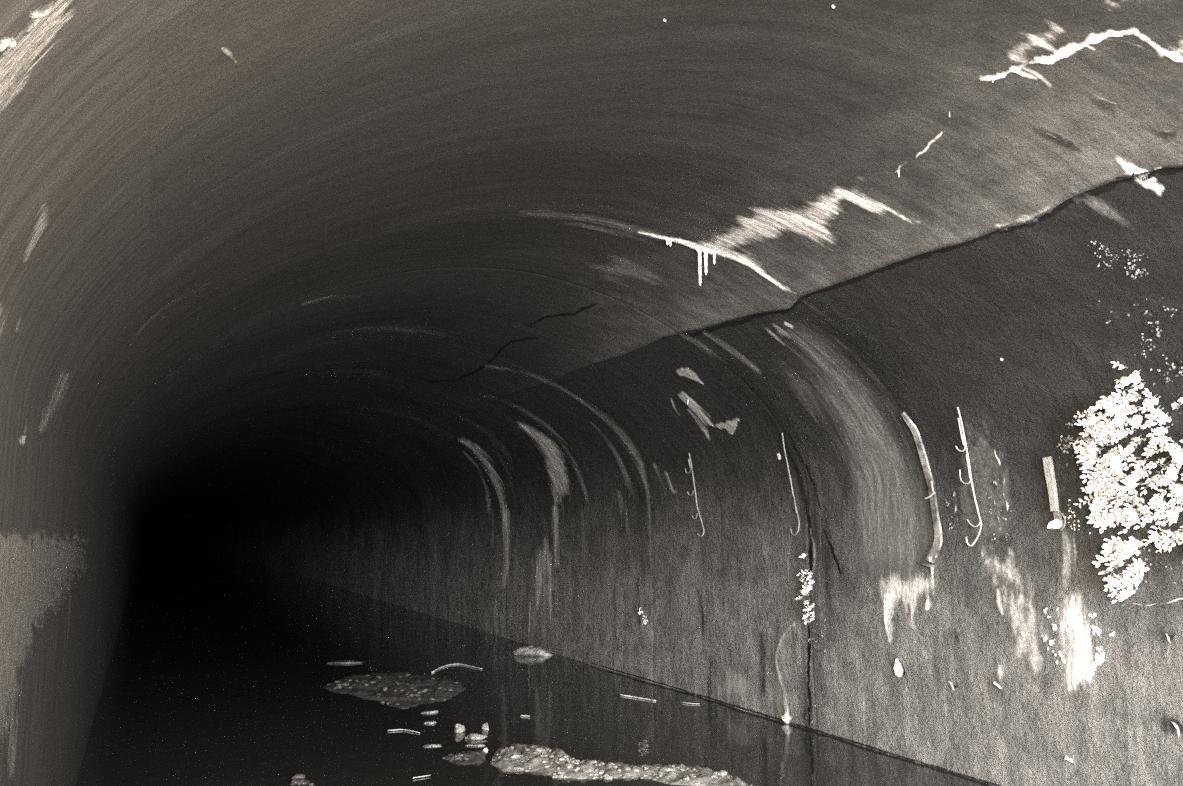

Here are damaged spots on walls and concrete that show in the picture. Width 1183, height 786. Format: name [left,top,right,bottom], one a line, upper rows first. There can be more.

leakage [986,32,1121,82]
leakage [551,190,904,290]
crack [686,168,1183,337]
leakage [774,322,934,632]
leakage [997,591,1113,681]